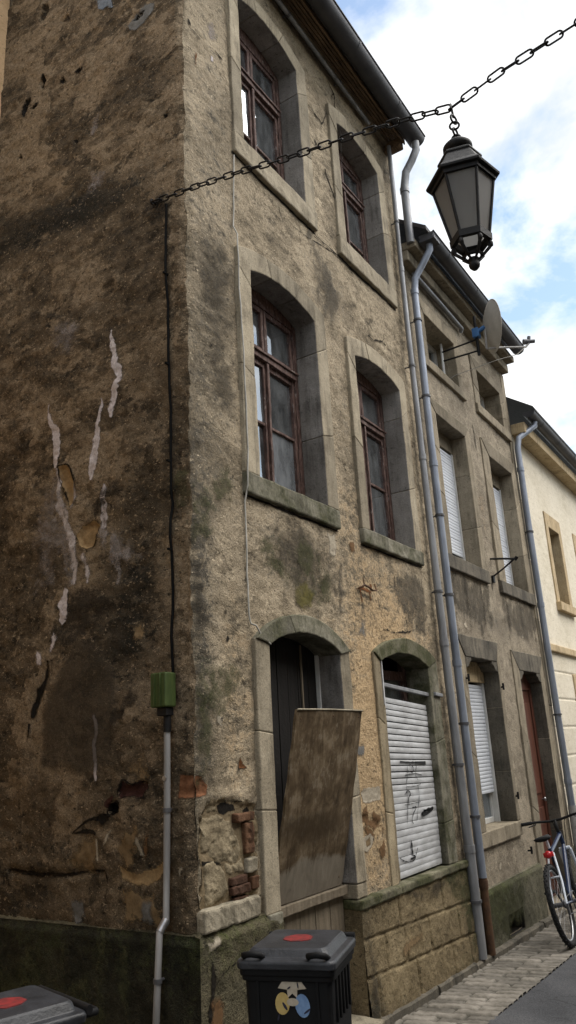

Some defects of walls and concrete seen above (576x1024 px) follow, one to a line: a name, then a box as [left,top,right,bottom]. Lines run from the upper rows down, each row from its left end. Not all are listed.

leakage [296,541,344,613]
crack [27,660,49,738]
crack [73,813,110,833]
spalling [118,825,163,927]
spalling [178,775,261,950]